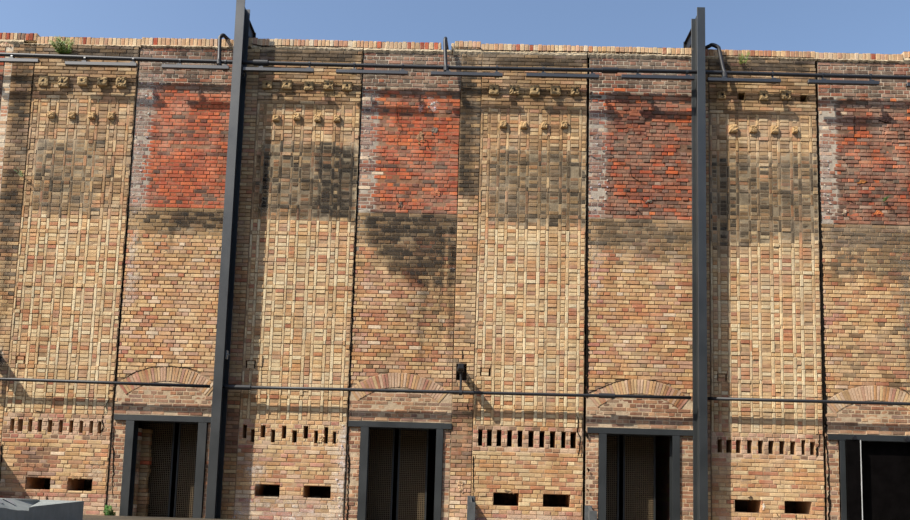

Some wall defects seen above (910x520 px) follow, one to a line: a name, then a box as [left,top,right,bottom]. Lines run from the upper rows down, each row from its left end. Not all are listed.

crack [101,116,197,496]
crack [349,104,459,395]
crack [576,125,672,492]